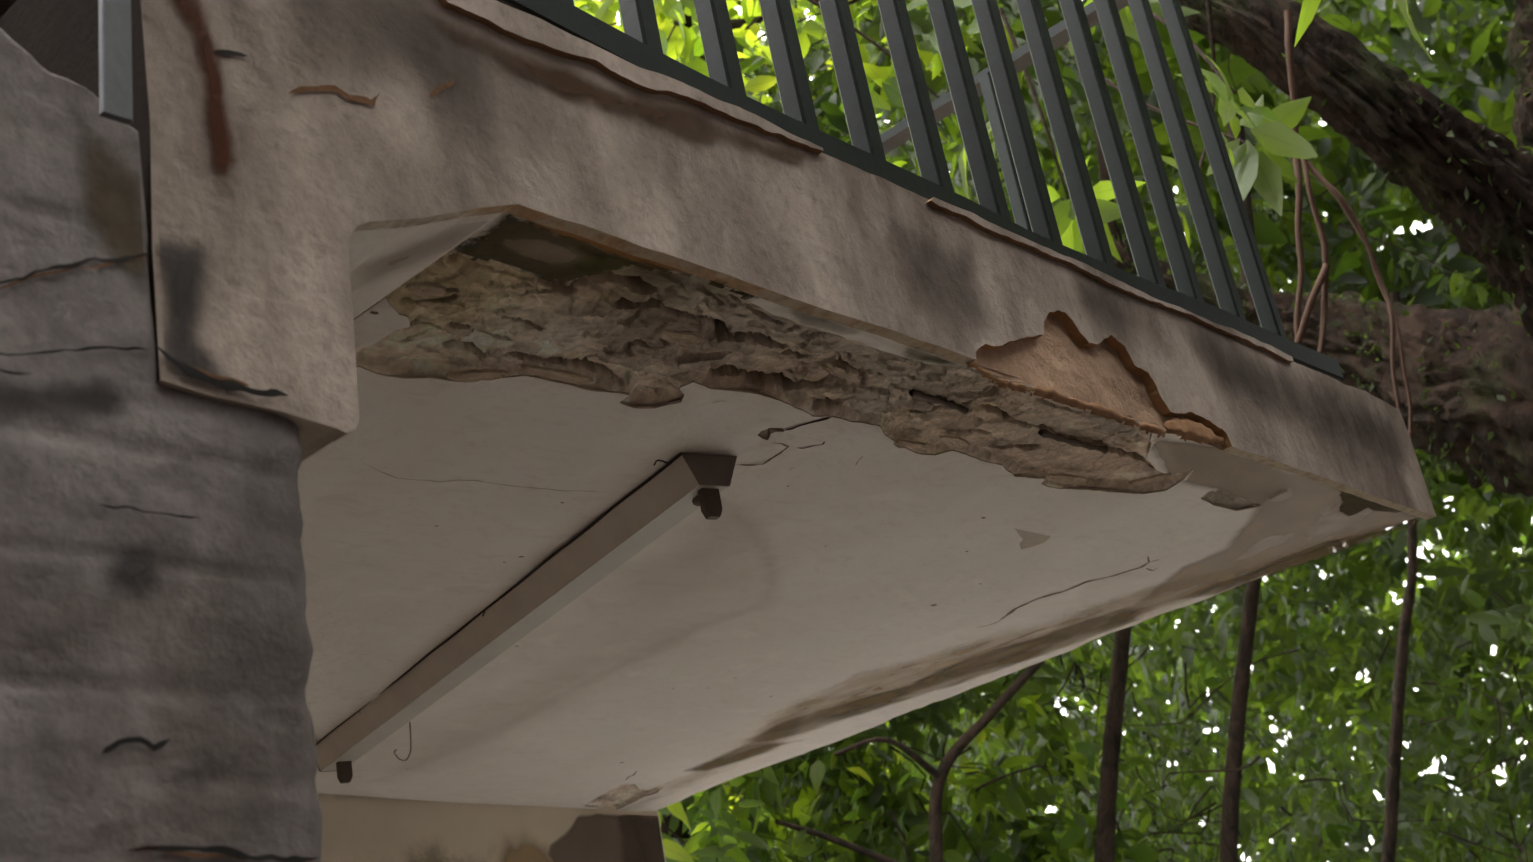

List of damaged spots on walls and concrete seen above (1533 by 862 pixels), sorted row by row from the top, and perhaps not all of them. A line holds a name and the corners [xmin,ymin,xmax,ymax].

rust [174,0,233,172]
crack [288,85,380,106]
crack [438,0,823,154]
crack [0,252,150,289]
spalling [355,250,1228,492]
crack [740,417,831,469]
crack [363,462,598,492]
spalling [1202,487,1287,509]
water stain [691,441,1417,771]
crack [981,557,1160,627]
crack [102,736,170,754]
crack [127,845,318,862]